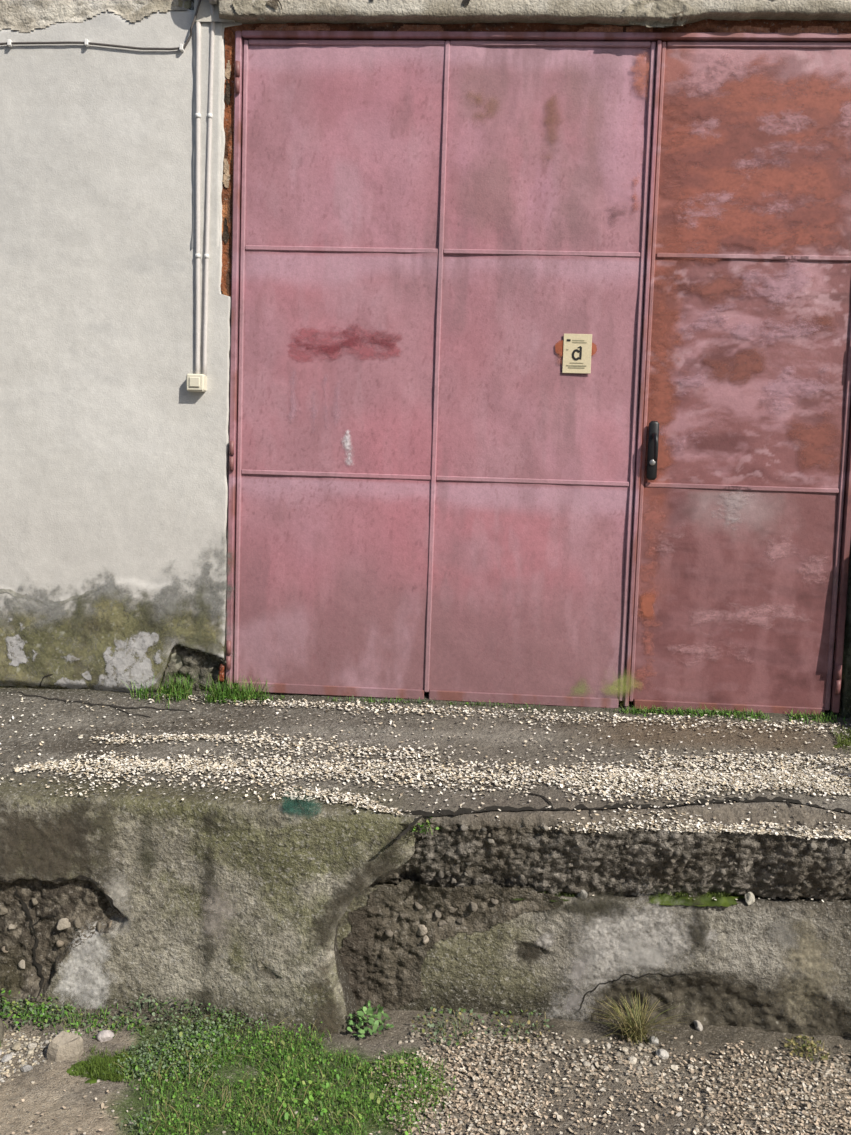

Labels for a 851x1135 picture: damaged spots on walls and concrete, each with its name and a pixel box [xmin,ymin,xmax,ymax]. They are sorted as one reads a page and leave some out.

flaking render [0,0,194,32]
damp [0,541,231,649]
flaking render [6,618,37,666]
flaking render [54,632,229,693]
crack [396,793,851,839]
spalling [0,875,125,1002]